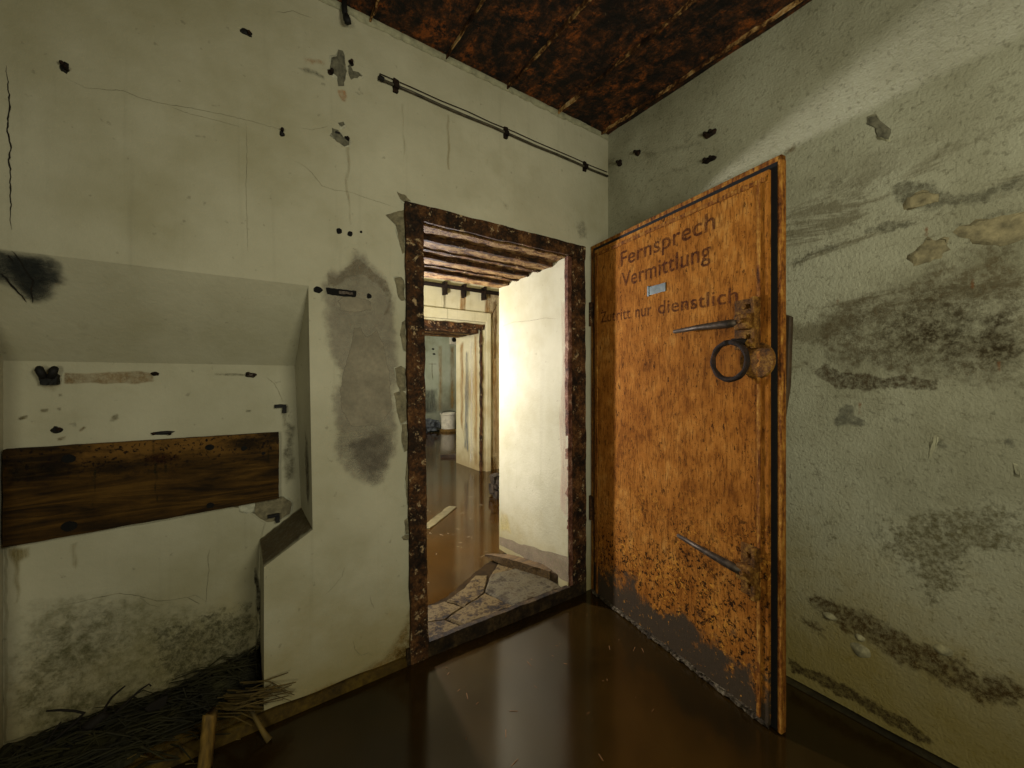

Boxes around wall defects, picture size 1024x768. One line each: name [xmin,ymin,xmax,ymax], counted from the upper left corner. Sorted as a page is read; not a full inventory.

spalling [329,50,364,86]
spalling [329,121,351,148]
spalling [866,114,891,142]
crack [0,73,34,303]
peeling [896,179,1019,210]
peeling [906,212,1024,266]
peeling [235,496,312,565]
leakage [810,597,1024,705]
leakage [790,661,930,743]